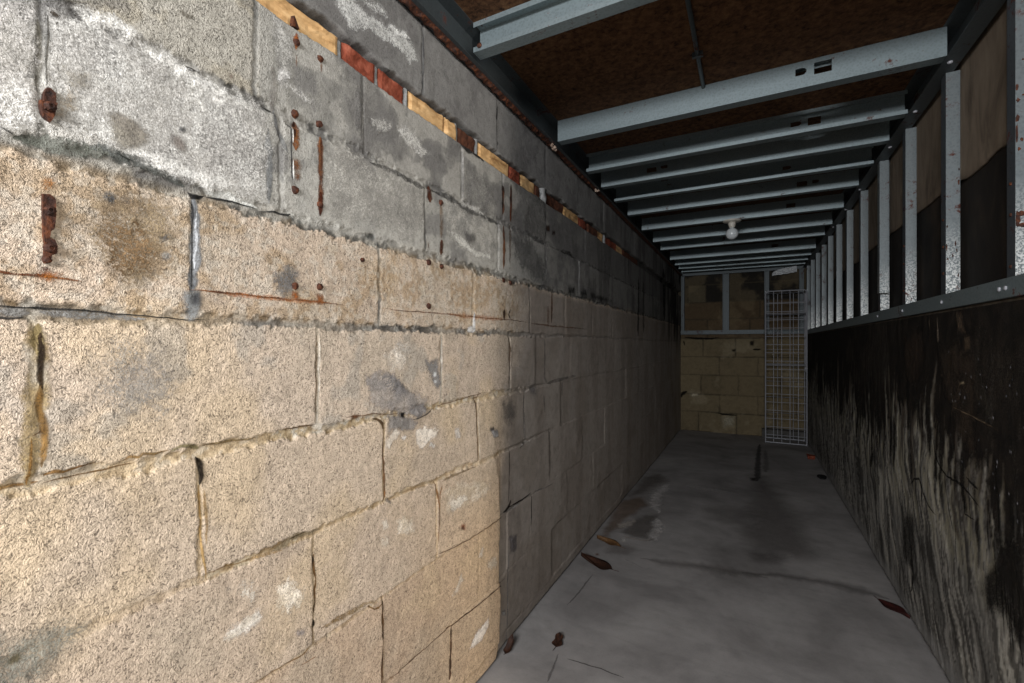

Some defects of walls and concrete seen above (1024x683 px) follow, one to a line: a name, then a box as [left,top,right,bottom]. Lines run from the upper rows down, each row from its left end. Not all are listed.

crack [35,11,59,91]
crack [0,65,294,292]
rust [292,122,300,179]
rust [0,268,79,281]
damp [88,188,177,284]
rust [189,289,340,305]
damp [384,342,410,374]
crack [0,305,504,683]
damp [808,299,1024,665]